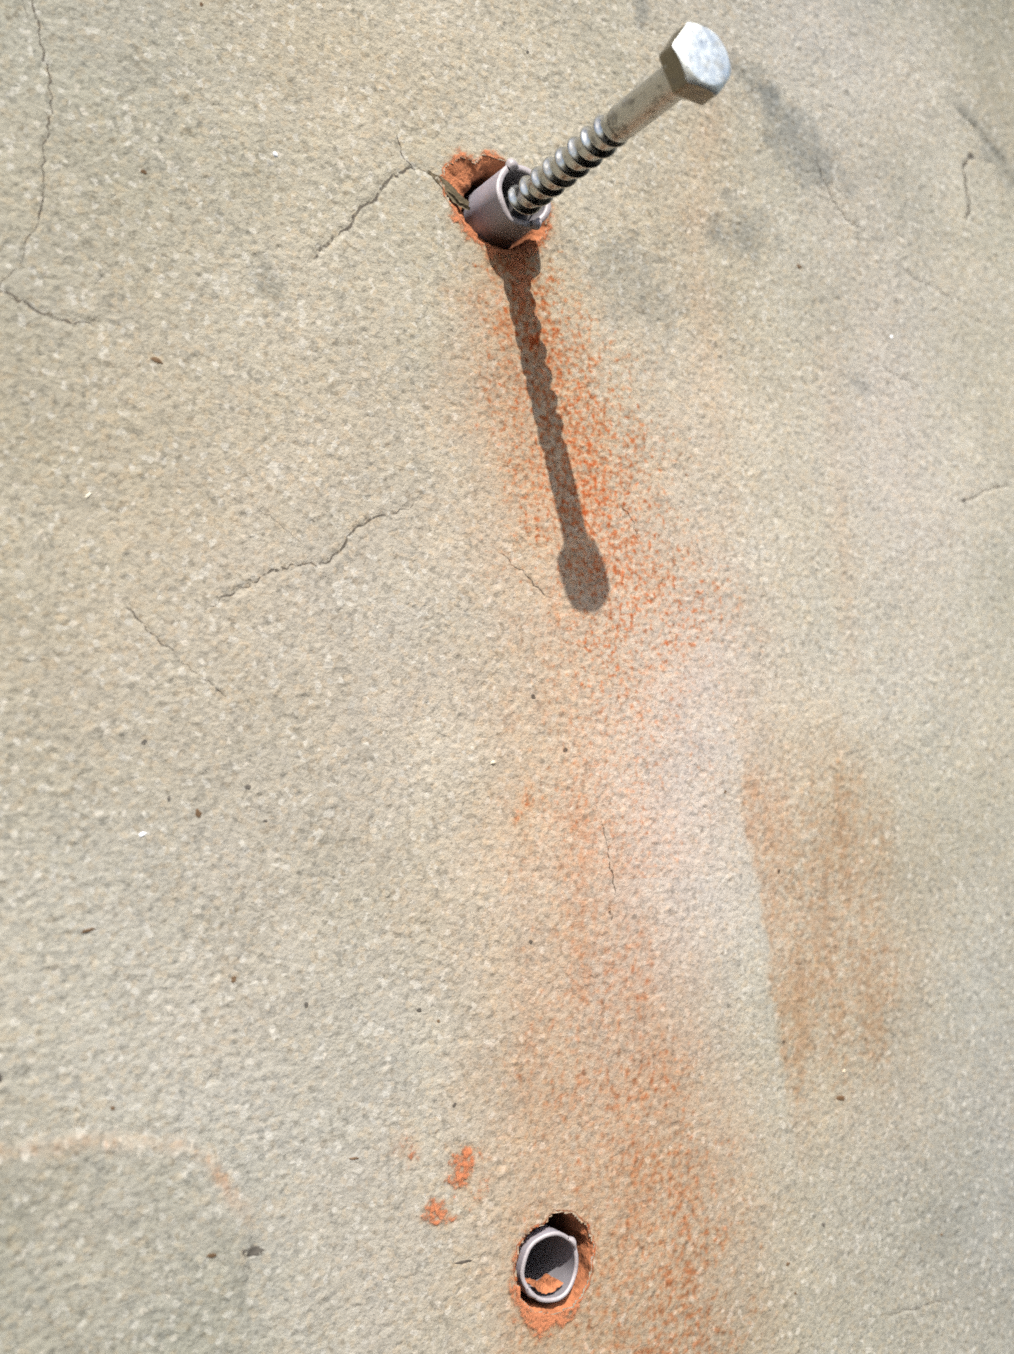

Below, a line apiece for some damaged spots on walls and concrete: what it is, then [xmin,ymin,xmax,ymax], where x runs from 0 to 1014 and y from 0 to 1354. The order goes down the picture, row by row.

crack [0,0,90,325]
crack [315,137,424,258]
corrosion [451,206,552,338]
crack [206,503,414,609]
corrosion [422,1146,481,1225]
corrosion [510,1255,580,1338]